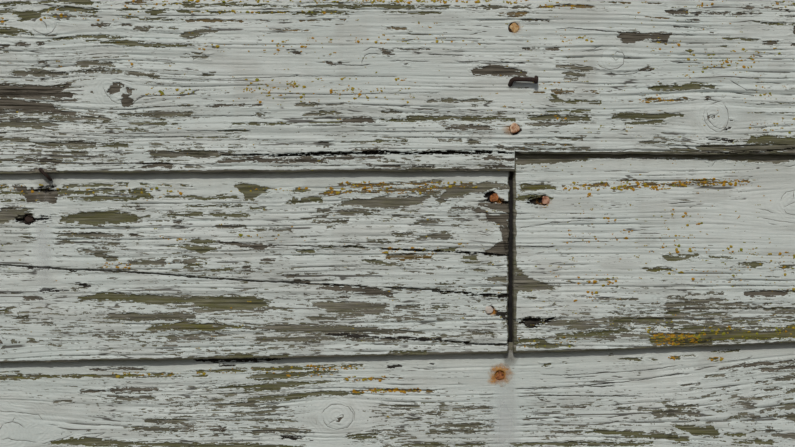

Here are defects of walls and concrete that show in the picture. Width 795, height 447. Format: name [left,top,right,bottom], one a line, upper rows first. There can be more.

peeling [0,0,631,60]
peeling [617,2,795,45]
peeling [0,61,194,173]
peeling [294,98,795,169]
peeling [527,65,602,127]
peeling [0,182,277,272]
peeling [130,139,566,299]
crack [0,250,308,284]
crack [385,285,444,293]
peeling [0,274,458,447]
corrosion [491,366,509,383]
peeling [509,290,795,447]